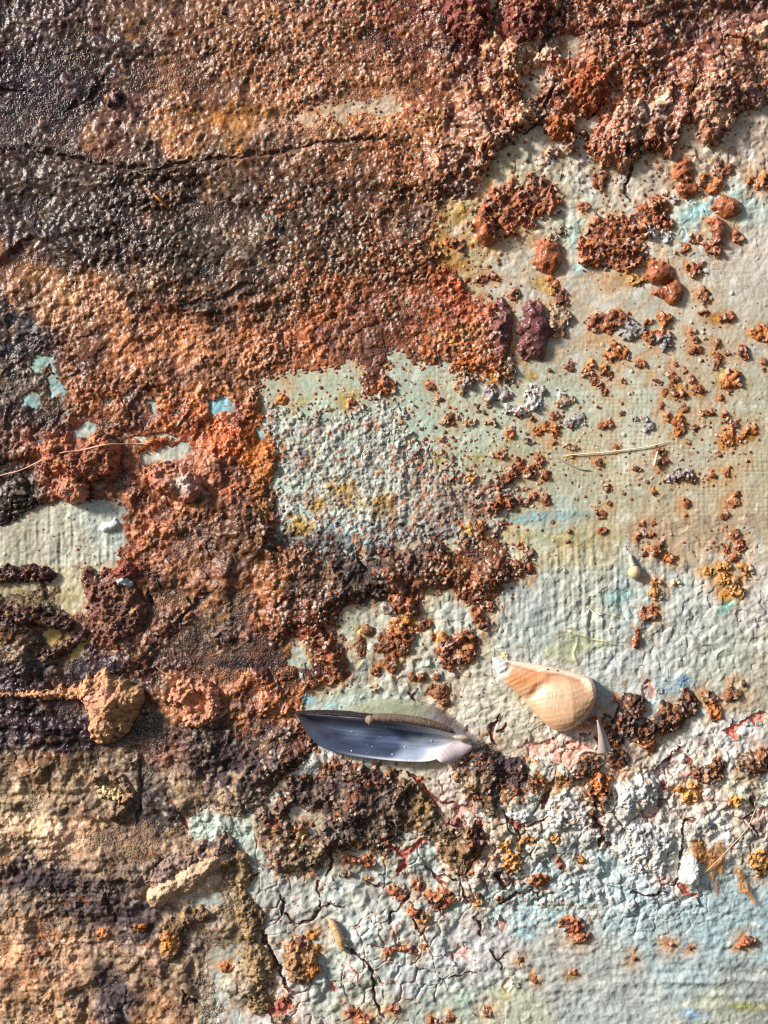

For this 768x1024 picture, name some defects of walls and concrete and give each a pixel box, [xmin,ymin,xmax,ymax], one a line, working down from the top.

crack [26,134,390,172]
corrosion [0,0,768,398]
corrosion [0,266,527,1024]
crack [356,770,469,813]
corrosion [455,744,570,819]
crack [502,788,552,836]
crack [591,816,611,847]
crack [630,818,696,896]
crack [743,795,759,837]
crack [251,847,344,993]
crack [366,836,539,982]
crack [346,947,385,1019]